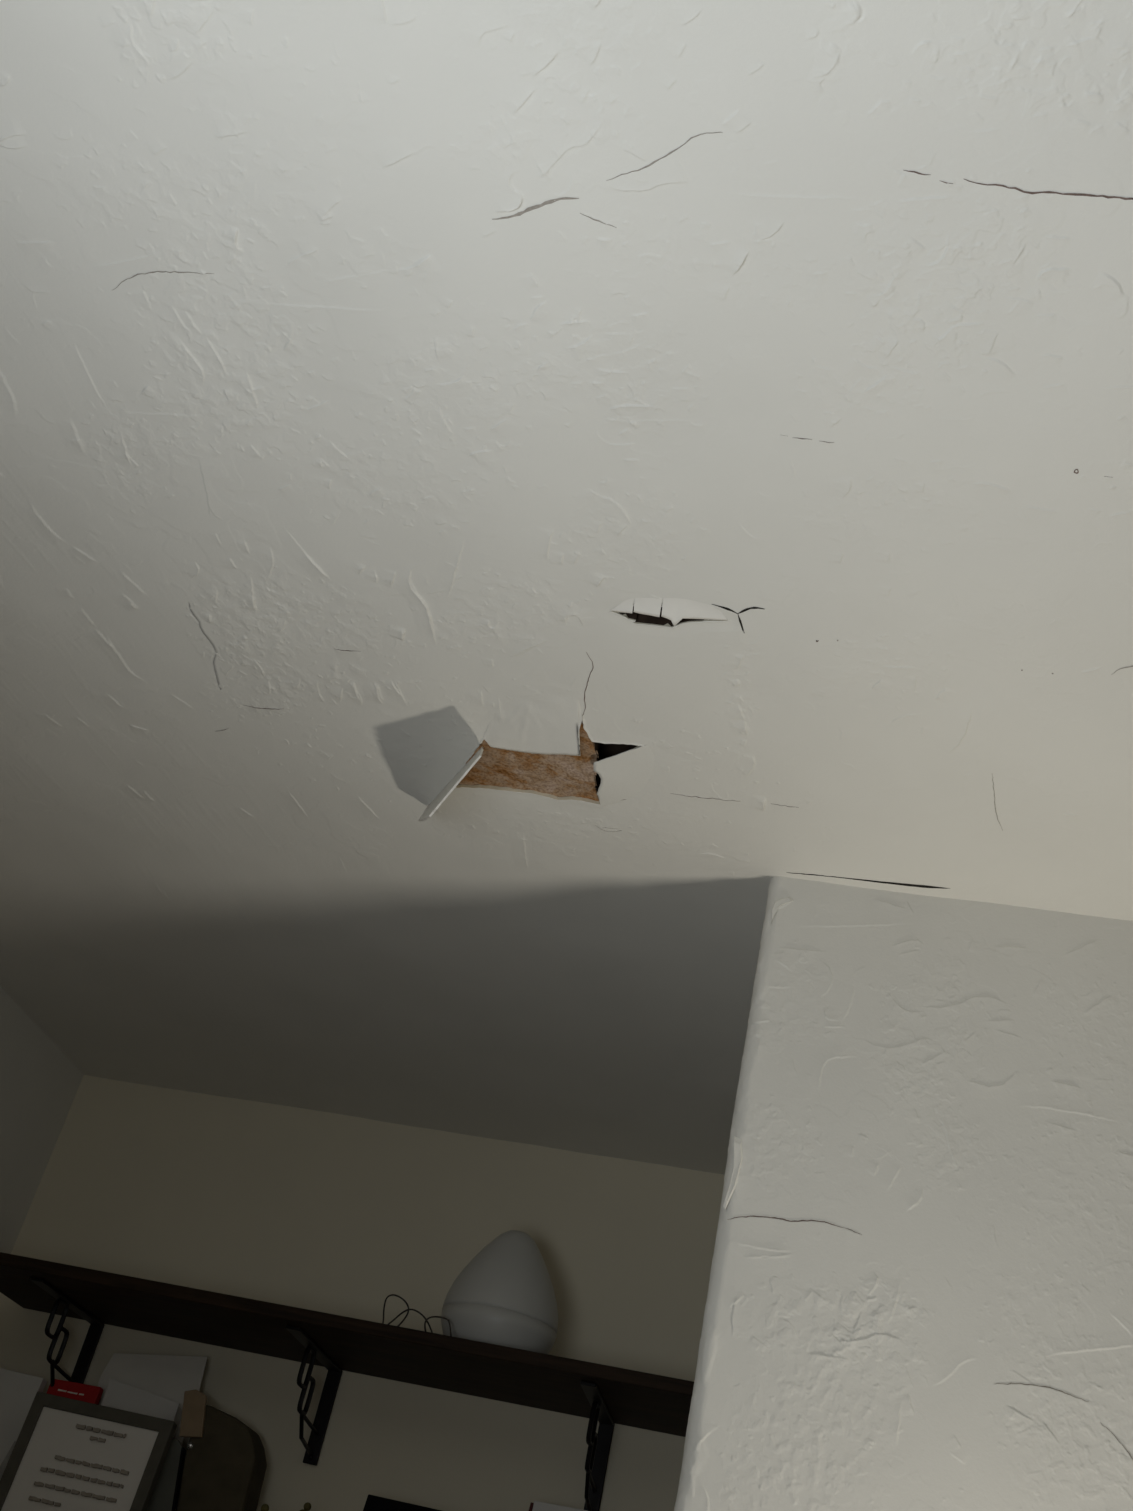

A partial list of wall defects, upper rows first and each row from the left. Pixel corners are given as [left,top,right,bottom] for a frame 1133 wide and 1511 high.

crack [904,170,1133,200]
crack [712,604,763,631]
peeling [484,692,655,806]